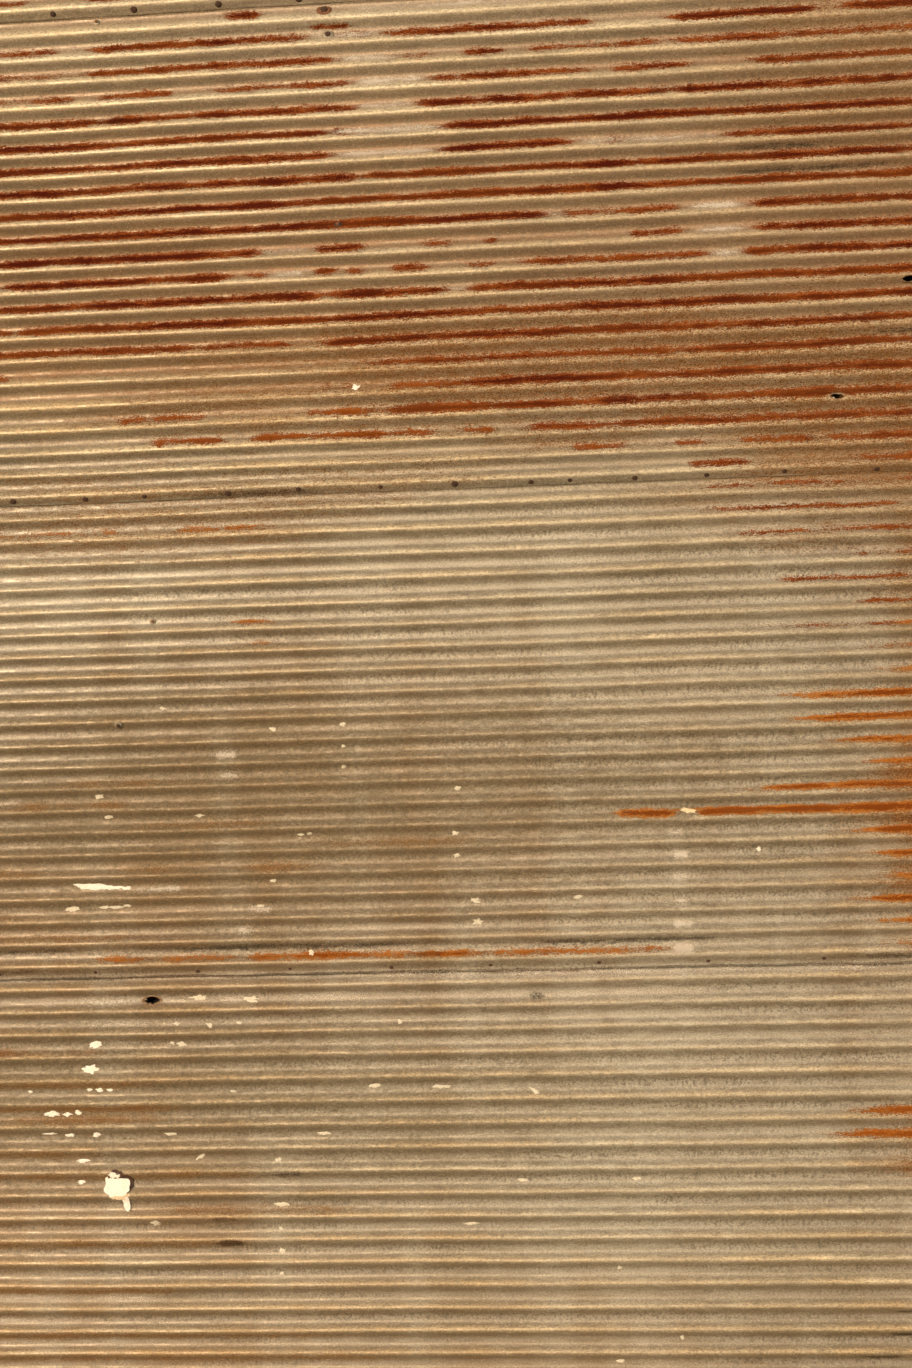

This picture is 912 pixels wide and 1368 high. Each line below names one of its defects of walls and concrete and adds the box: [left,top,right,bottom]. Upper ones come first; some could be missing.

rust [0,0,912,557]
rust [231,619,275,646]
rust [746,572,912,649]
rust [612,664,912,945]
rust [88,944,670,965]
rust [822,1104,912,1175]